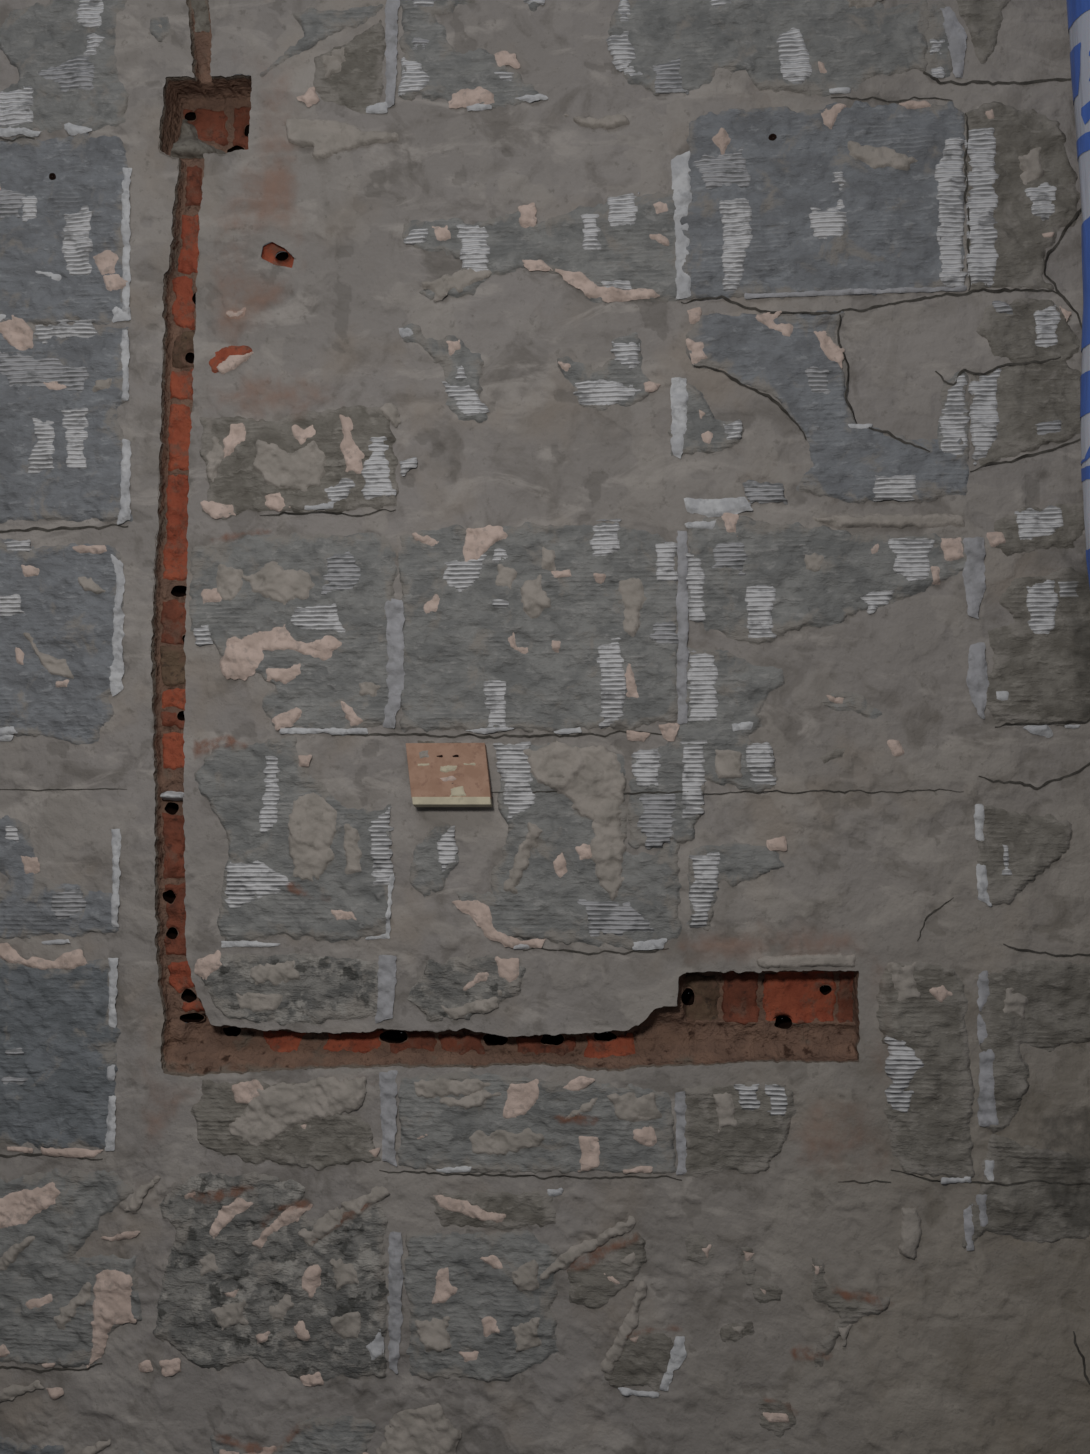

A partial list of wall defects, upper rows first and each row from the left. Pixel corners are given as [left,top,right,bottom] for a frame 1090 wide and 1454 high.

crack [681,71,1082,452]
spalling [0,0,133,745]
spalling [171,0,1090,1043]
crack [995,718,1090,728]
crack [623,762,1090,795]
spalling [164,802,179,815]
spalling [0,815,797,1402]
spalling [876,960,1090,1251]
peeling [898,1207,922,1259]
spalling [0,1436,111,1454]
spalling [210,1403,462,1454]
spalling [758,1398,796,1438]